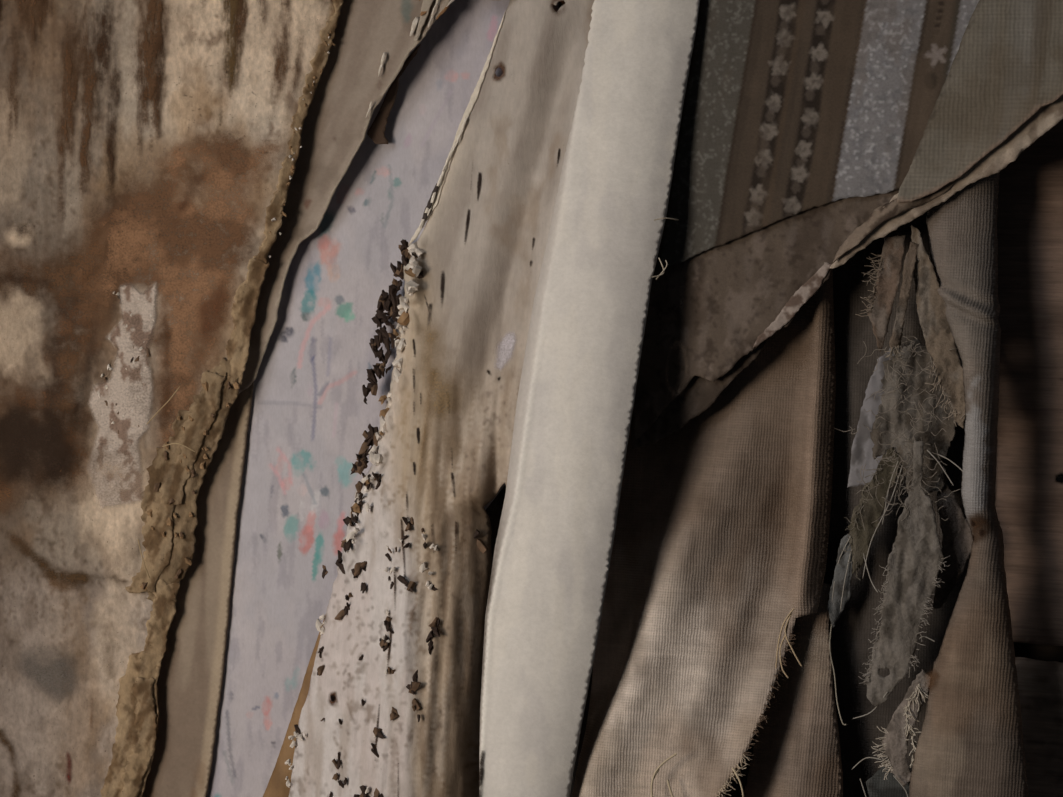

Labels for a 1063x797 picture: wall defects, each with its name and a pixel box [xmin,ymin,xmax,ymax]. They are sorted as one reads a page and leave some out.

water stain [274,25,299,89]
water stain [0,0,278,512]
peeling [89,0,344,797]
water stain [10,536,90,588]
peeling [329,752,383,797]